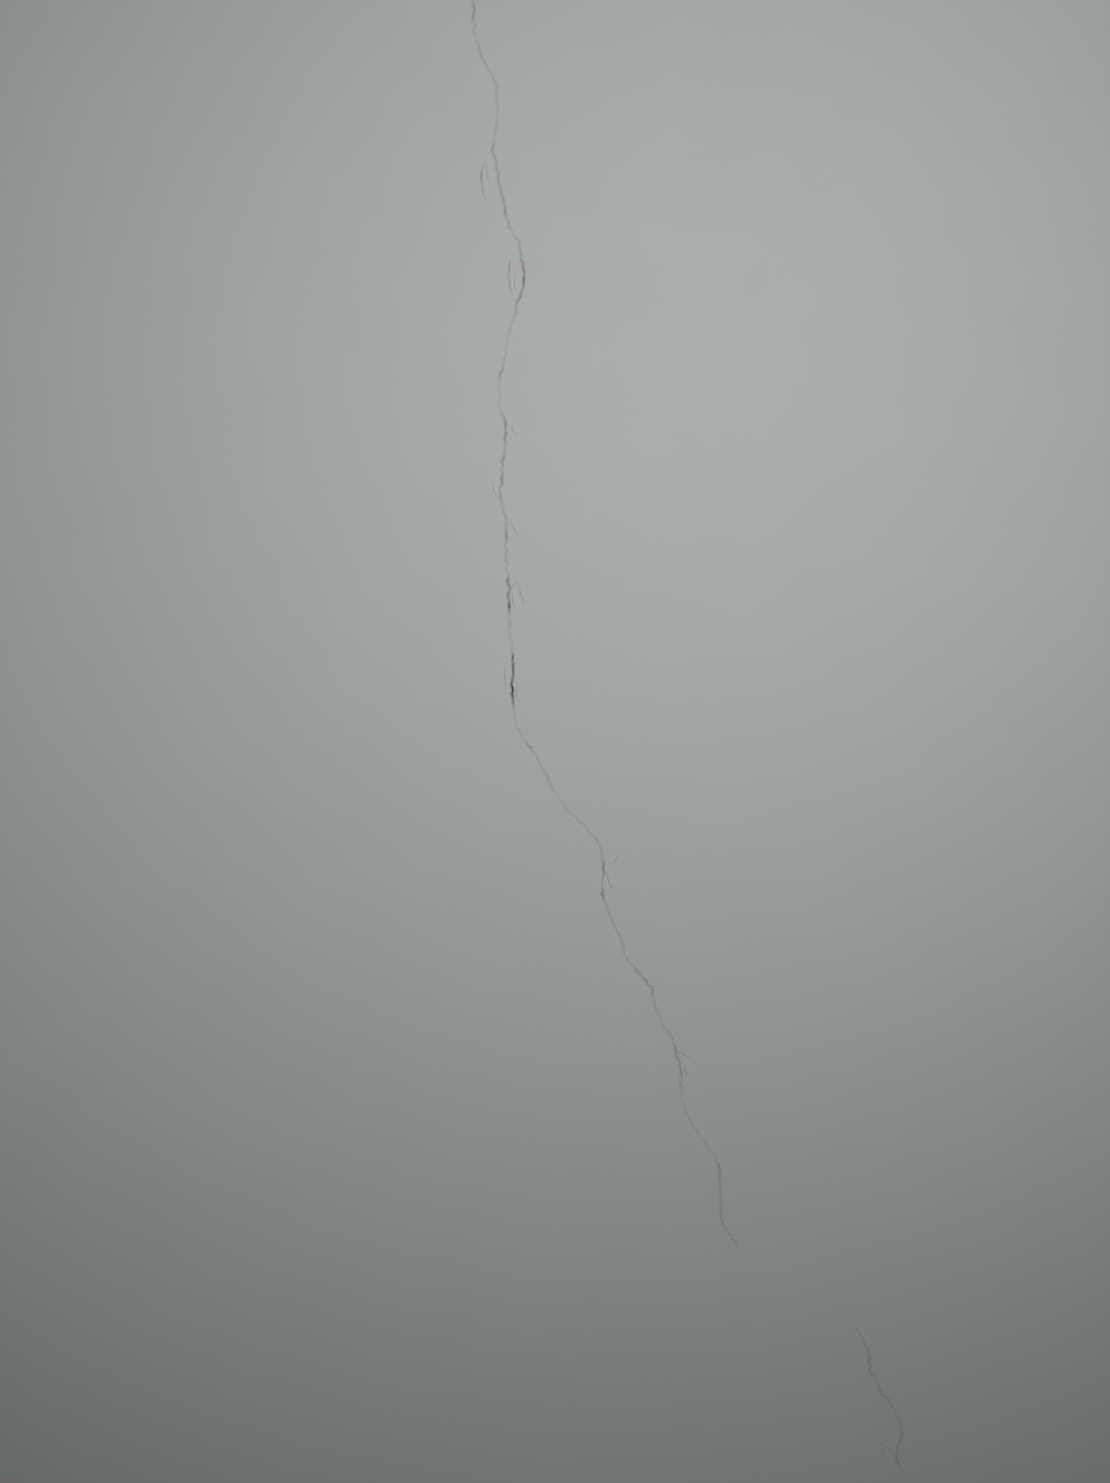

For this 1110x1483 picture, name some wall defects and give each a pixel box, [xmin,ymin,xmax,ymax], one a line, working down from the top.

crack [471,0,738,1248]